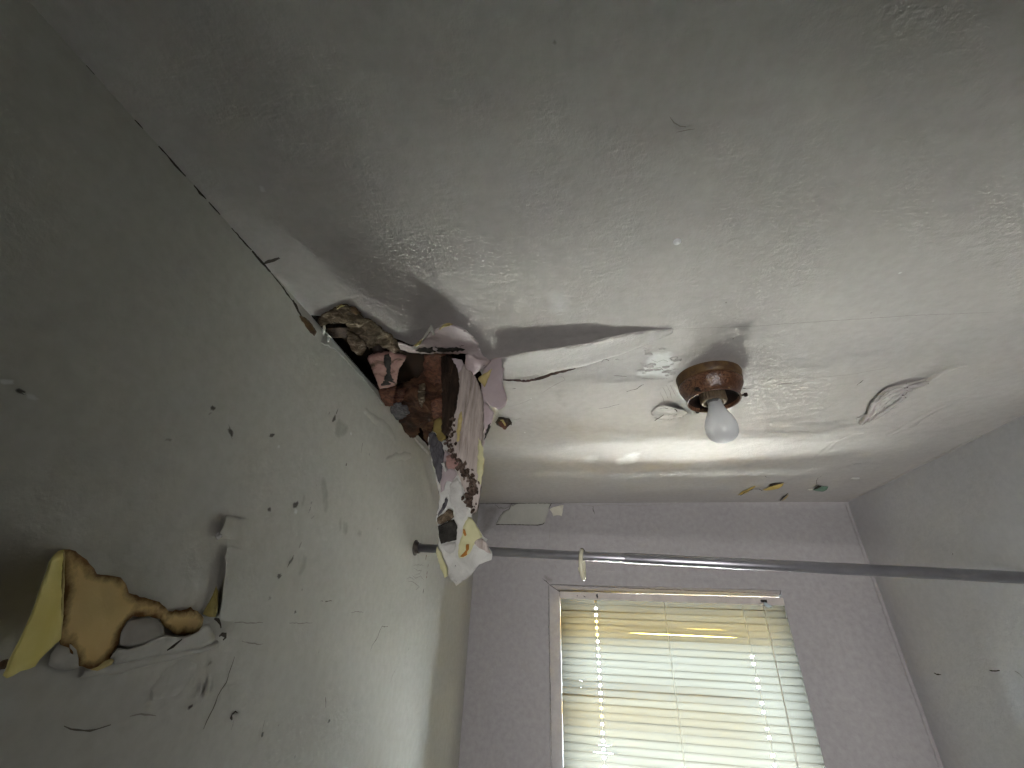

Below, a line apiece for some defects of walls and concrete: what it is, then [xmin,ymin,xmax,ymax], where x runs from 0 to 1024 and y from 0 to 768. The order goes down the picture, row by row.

crack [135,120,302,316]
peeling [478,358,512,446]
peeling [625,343,685,403]
peeling [739,482,788,501]